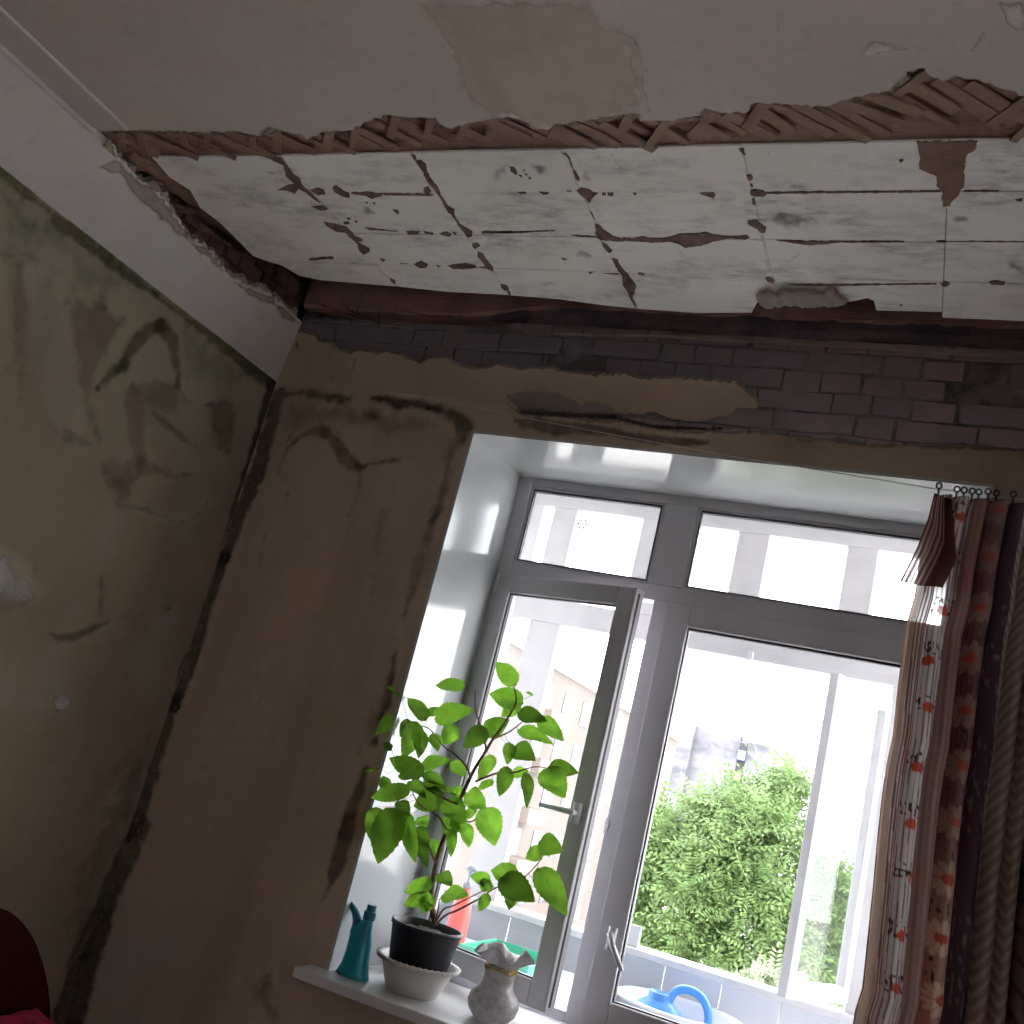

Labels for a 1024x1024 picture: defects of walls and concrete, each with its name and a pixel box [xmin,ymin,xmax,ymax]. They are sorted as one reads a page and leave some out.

damp [0,166,344,1024]
damp [291,427,396,469]
damp [375,396,472,442]
flaking render [102,132,1024,451]